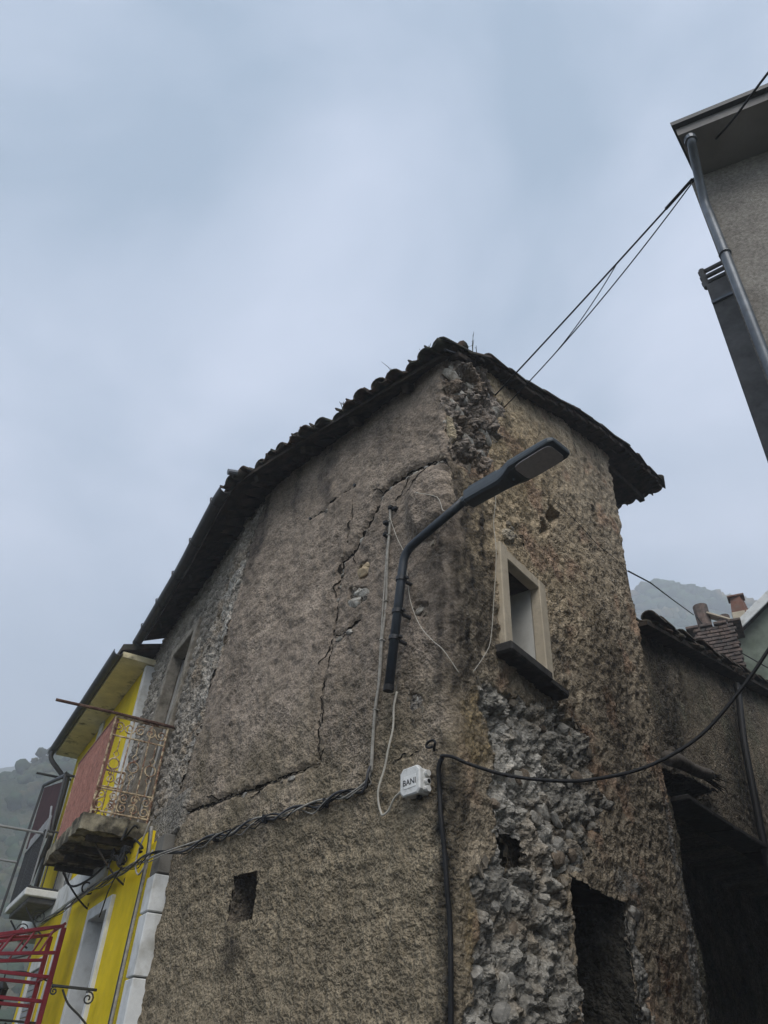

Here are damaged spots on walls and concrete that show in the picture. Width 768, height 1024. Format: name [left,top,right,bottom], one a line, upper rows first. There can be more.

flaking render [439,359,506,474]
peeling [152,504,266,818]
crack [188,456,449,813]
flaking render [462,675,615,1024]
spalling [620,894,656,1024]